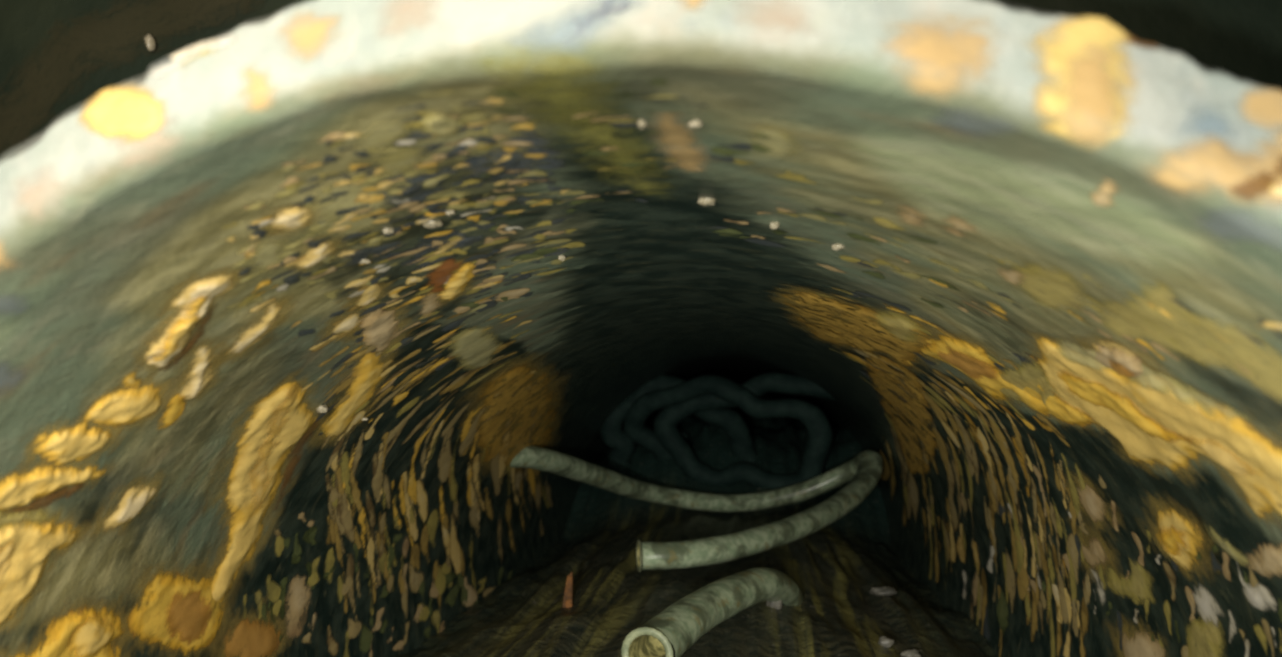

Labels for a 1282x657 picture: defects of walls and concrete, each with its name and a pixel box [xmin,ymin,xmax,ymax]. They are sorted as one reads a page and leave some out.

corrosion [80,87,163,140]
corrosion [1037,16,1130,142]
corrosion [1156,89,1282,200]
corrosion [781,259,1282,657]